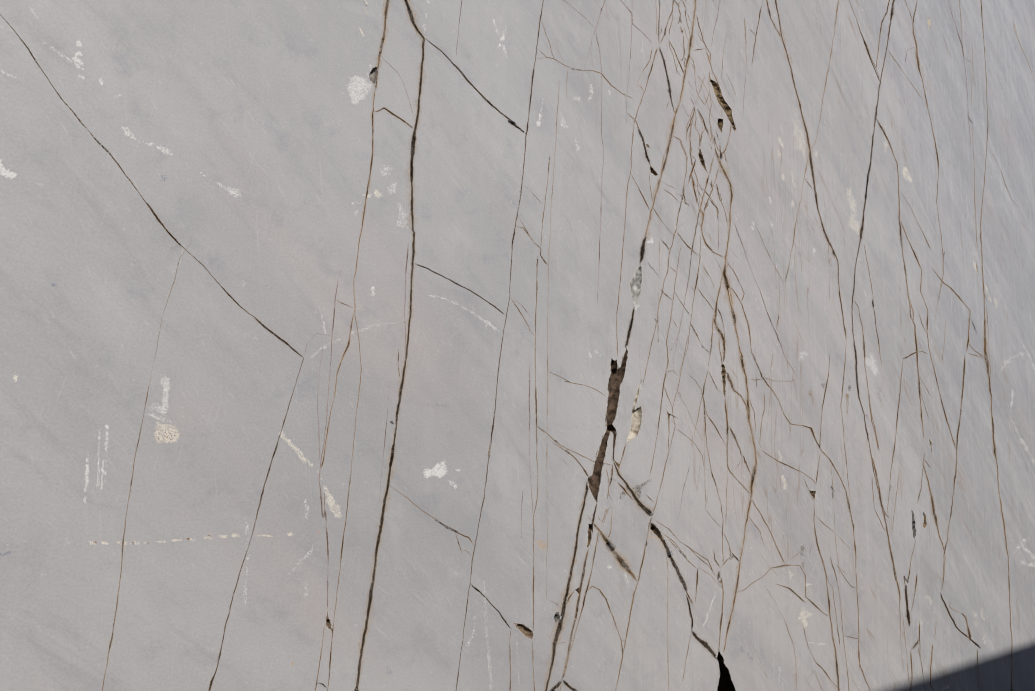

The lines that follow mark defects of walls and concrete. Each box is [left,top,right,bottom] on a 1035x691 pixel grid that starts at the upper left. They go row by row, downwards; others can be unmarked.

crack [0,0,629,691]
spalling [587,347,643,503]
crack [542,0,871,691]
spalling [708,73,737,133]
crack [744,0,1019,691]